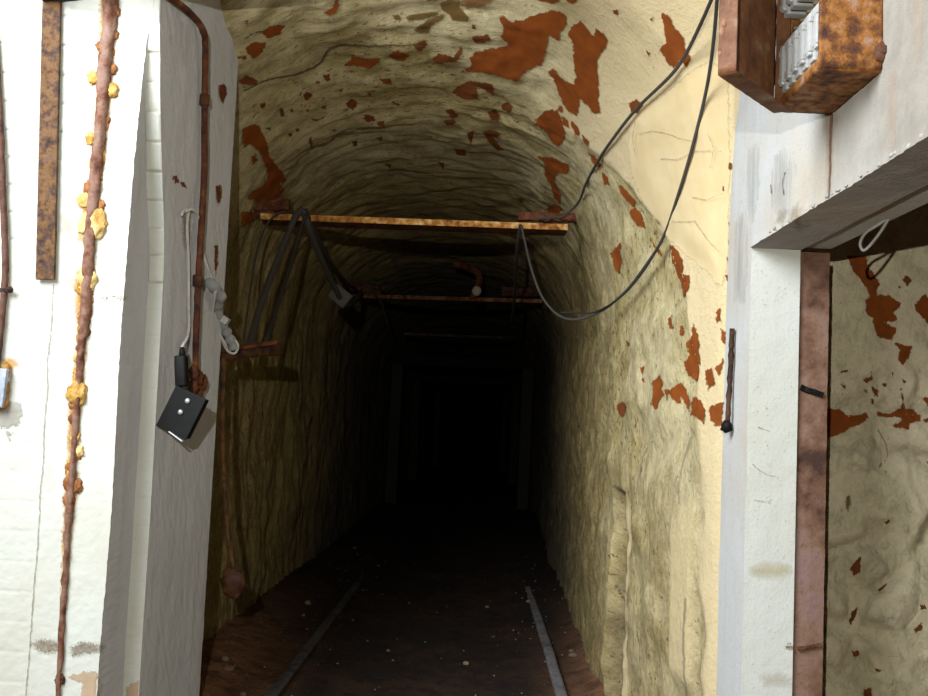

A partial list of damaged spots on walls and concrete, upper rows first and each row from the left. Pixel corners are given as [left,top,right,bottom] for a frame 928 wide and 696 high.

peeling [341,40,427,69]
peeling [432,0,645,229]
peeling [242,124,286,203]
corrosion [75,291,94,359]
peeling [847,255,912,365]
peeling [915,294,928,324]
corrosion [0,359,16,410]
peeling [640,317,724,426]
peeling [827,372,928,438]
spalling [68,671,102,696]